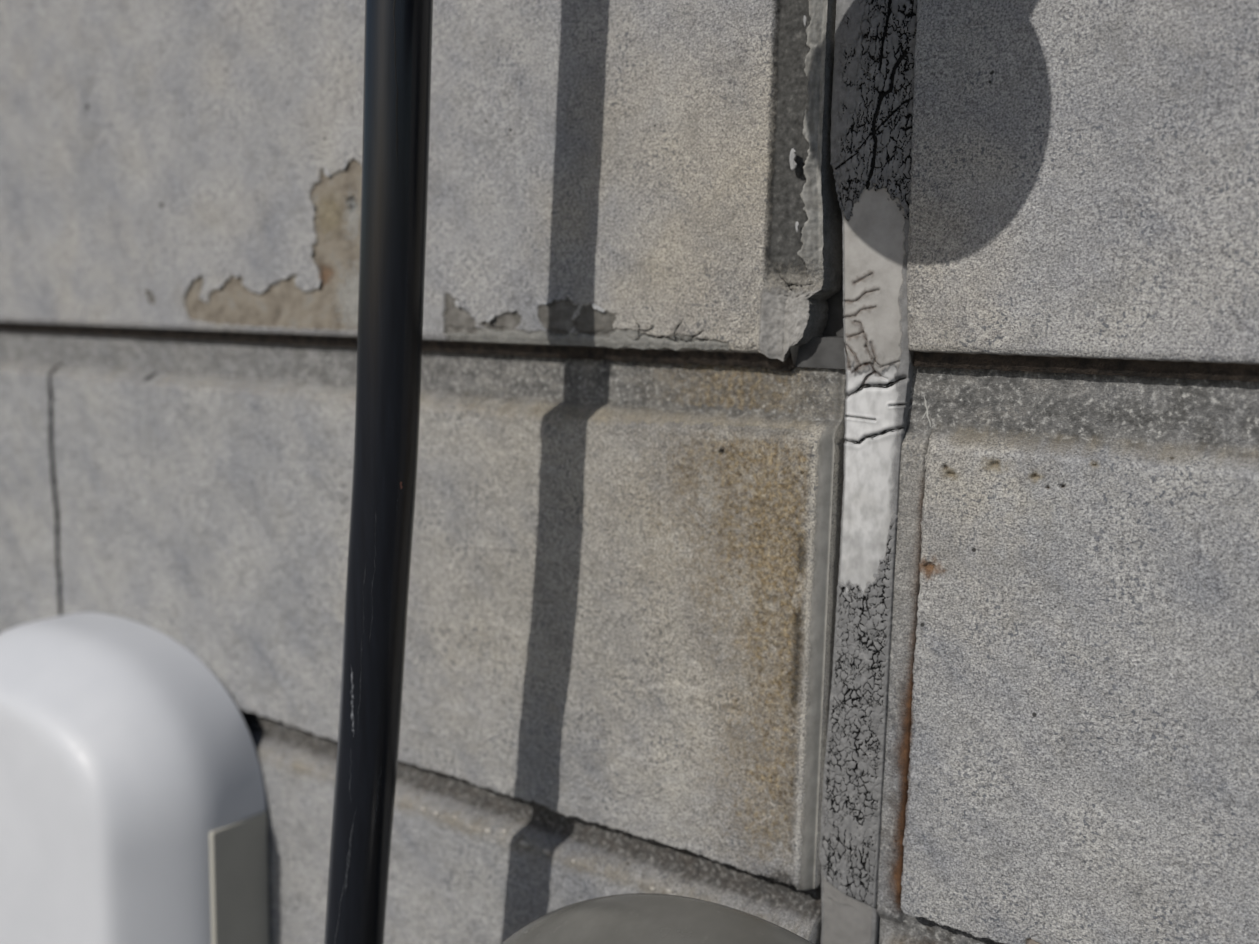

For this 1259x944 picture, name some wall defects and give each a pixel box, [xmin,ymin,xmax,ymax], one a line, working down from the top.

crack [835,0,917,218]
peeling [185,160,362,330]
peeling [444,293,521,334]
peeling [538,298,605,335]
spalling [759,288,822,361]
crack [844,274,927,444]
crack [48,365,66,616]
crack [822,526,892,907]